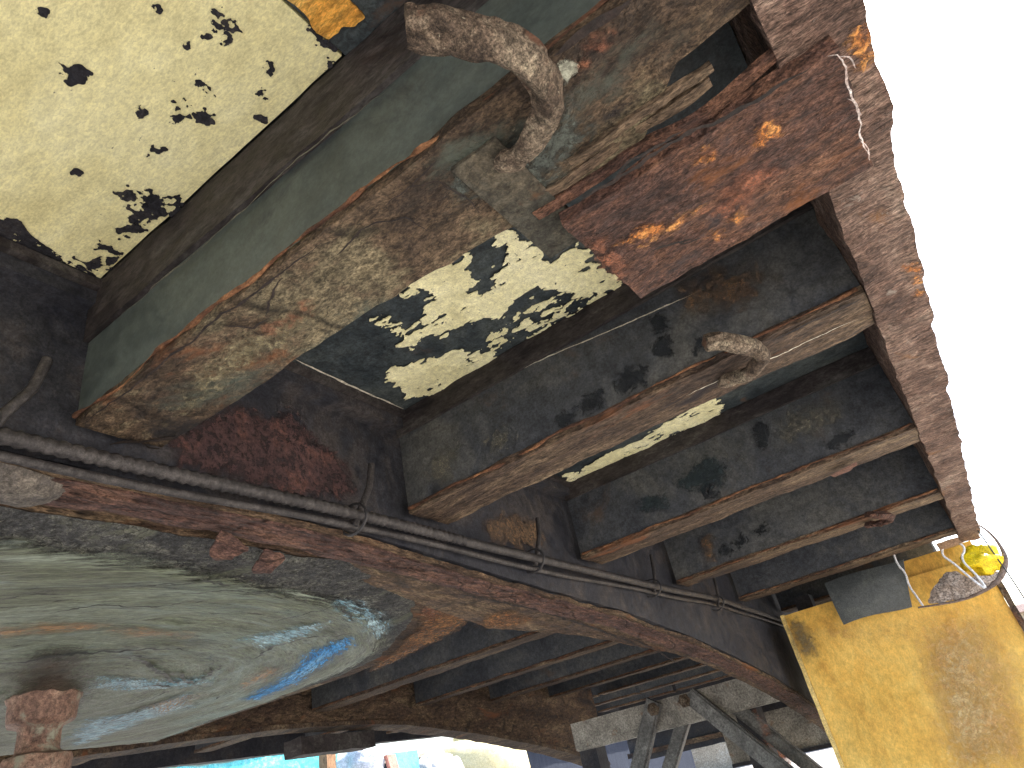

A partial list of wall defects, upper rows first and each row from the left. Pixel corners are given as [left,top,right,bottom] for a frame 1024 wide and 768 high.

peeling [288,0,365,71]
corrosion [753,122,780,146]
corrosion [830,25,875,161]
peeling [0,184,185,277]
corrosion [623,219,683,243]
peeling [369,230,622,400]
damp [554,312,676,428]
corrosion [169,407,357,500]
peeling [562,398,725,482]
damp [678,457,731,500]
damp [752,421,769,450]
damp [718,522,768,557]